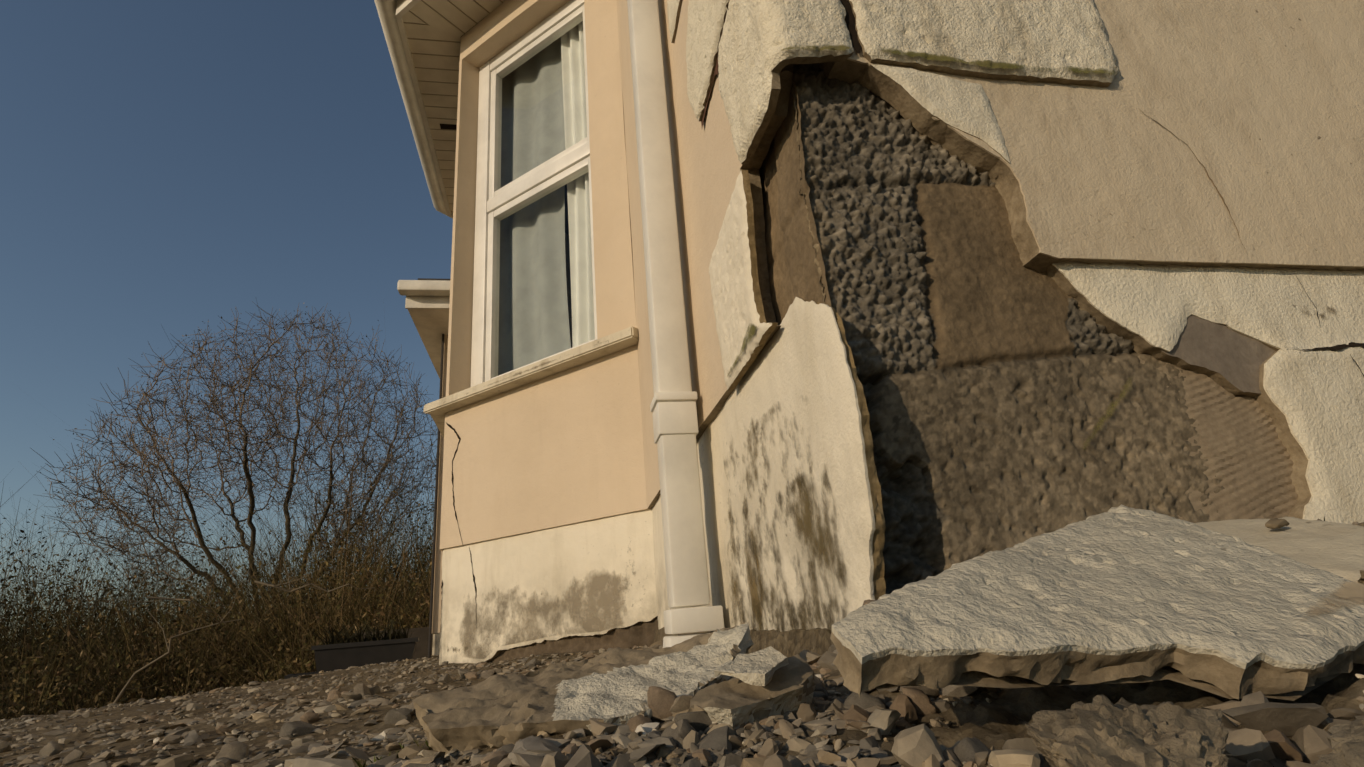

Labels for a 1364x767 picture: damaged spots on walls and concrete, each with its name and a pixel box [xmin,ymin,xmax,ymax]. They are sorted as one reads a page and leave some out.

crack [840,0,861,53]
spalling [759,63,1298,594]
crack [1291,276,1364,376]
crack [440,423,477,647]
damp [453,575,624,659]
damp [729,471,846,634]